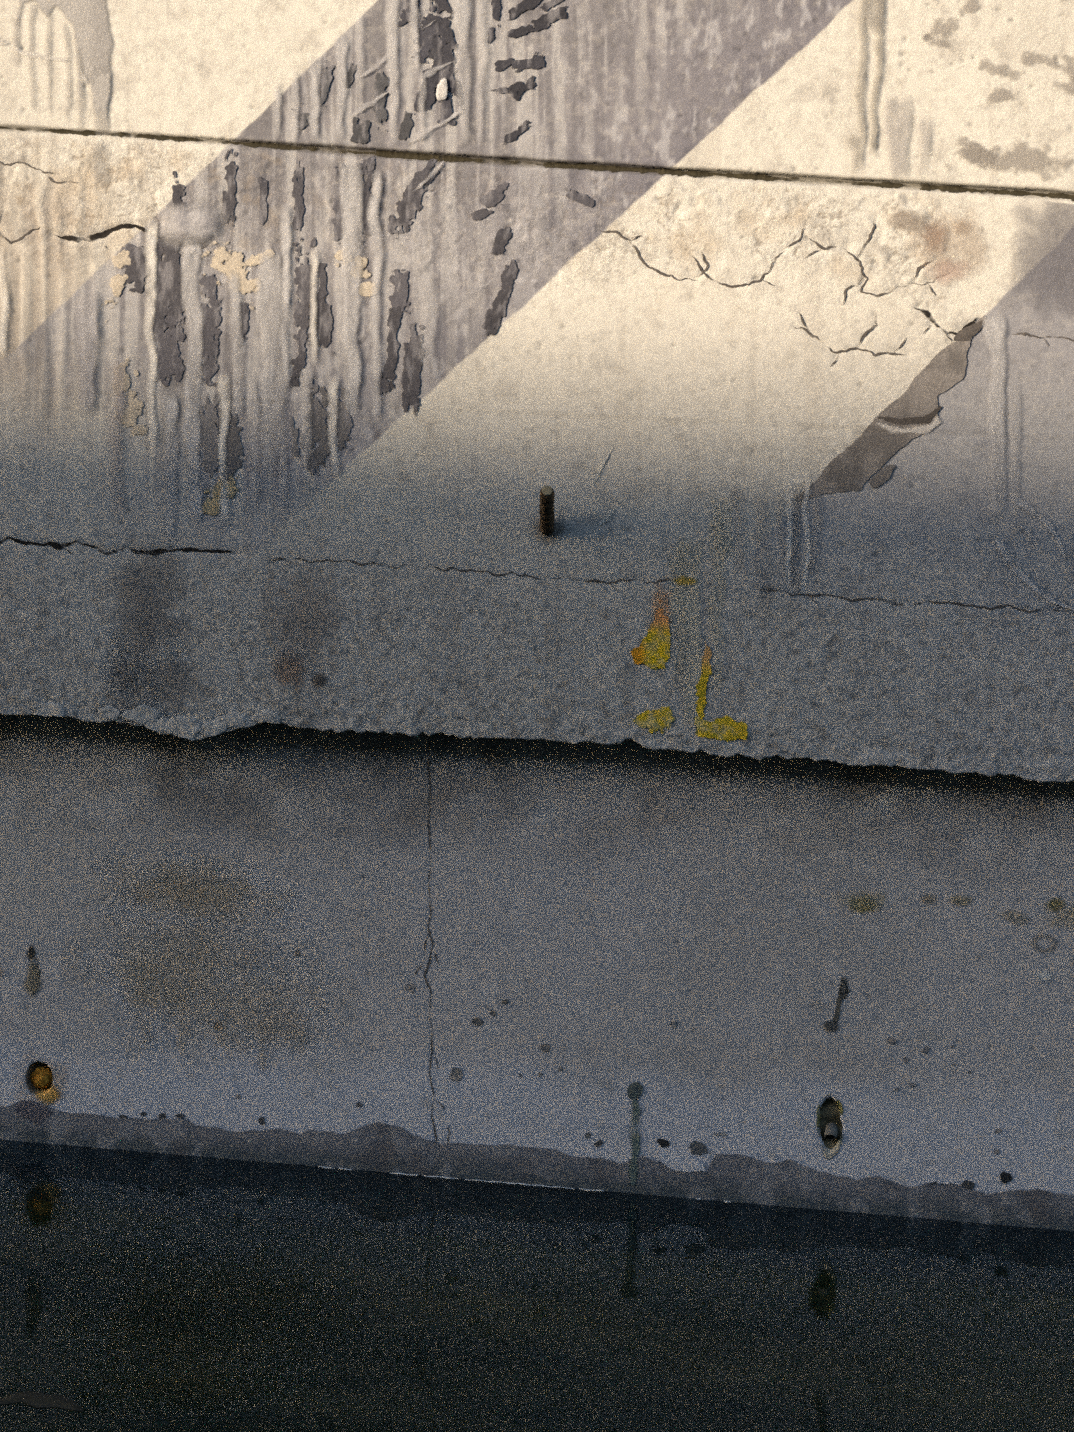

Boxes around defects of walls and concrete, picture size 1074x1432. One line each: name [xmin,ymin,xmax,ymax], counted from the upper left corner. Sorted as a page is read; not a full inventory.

leakage [0,0,113,128]
leakage [0,278,8,351]
crack [0,210,224,254]
peeling [102,148,274,515]
peeling [289,0,463,475]
peeling [471,182,508,220]
peeling [481,226,518,336]
crack [601,217,977,367]
peeling [795,315,986,502]
crack [0,537,233,556]
crack [270,558,675,592]
corrosion [37,1085,59,1103]